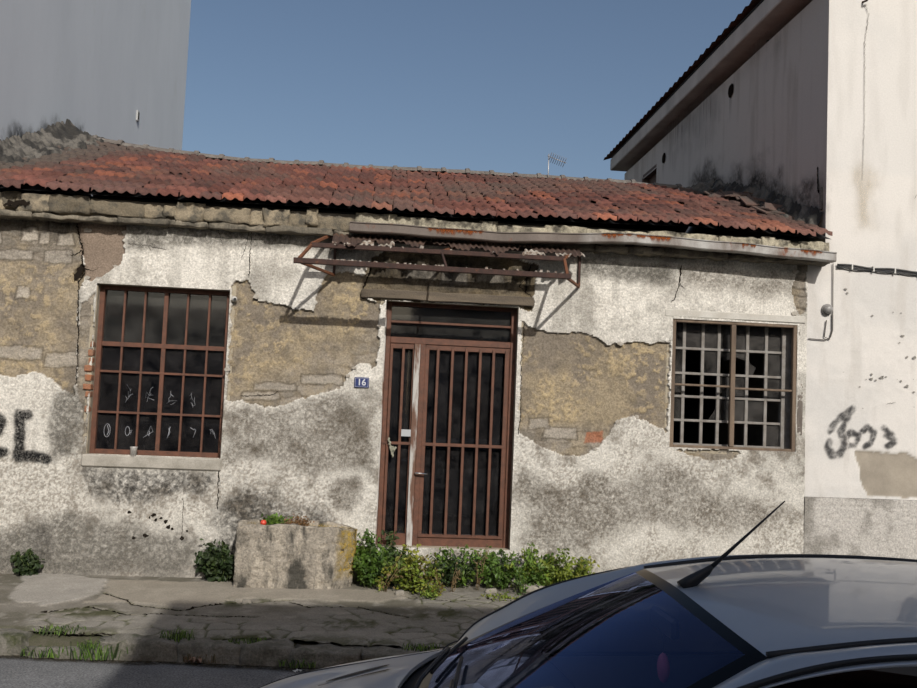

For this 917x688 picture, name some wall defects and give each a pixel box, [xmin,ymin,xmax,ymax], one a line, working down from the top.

crack [861,4,869,180]
flaking render [0,218,127,442]
crack [71,224,96,385]
flaking render [224,252,539,407]
flaking render [519,321,672,456]